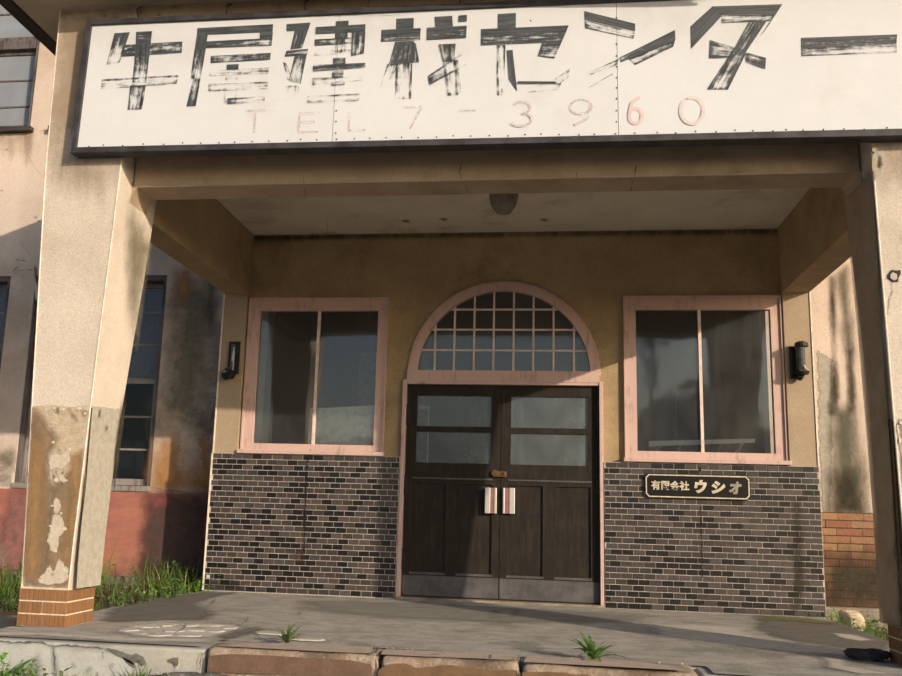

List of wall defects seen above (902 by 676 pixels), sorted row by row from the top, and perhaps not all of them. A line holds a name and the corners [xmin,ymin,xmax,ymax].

leakage [130,222,149,308]
leakage [166,284,220,425]
leakage [817,175,900,627]
leakage [114,403,125,488]
peeling [31,405,121,588]
leakage [140,494,208,578]
leakage [307,601,642,622]
leakage [647,615,899,674]